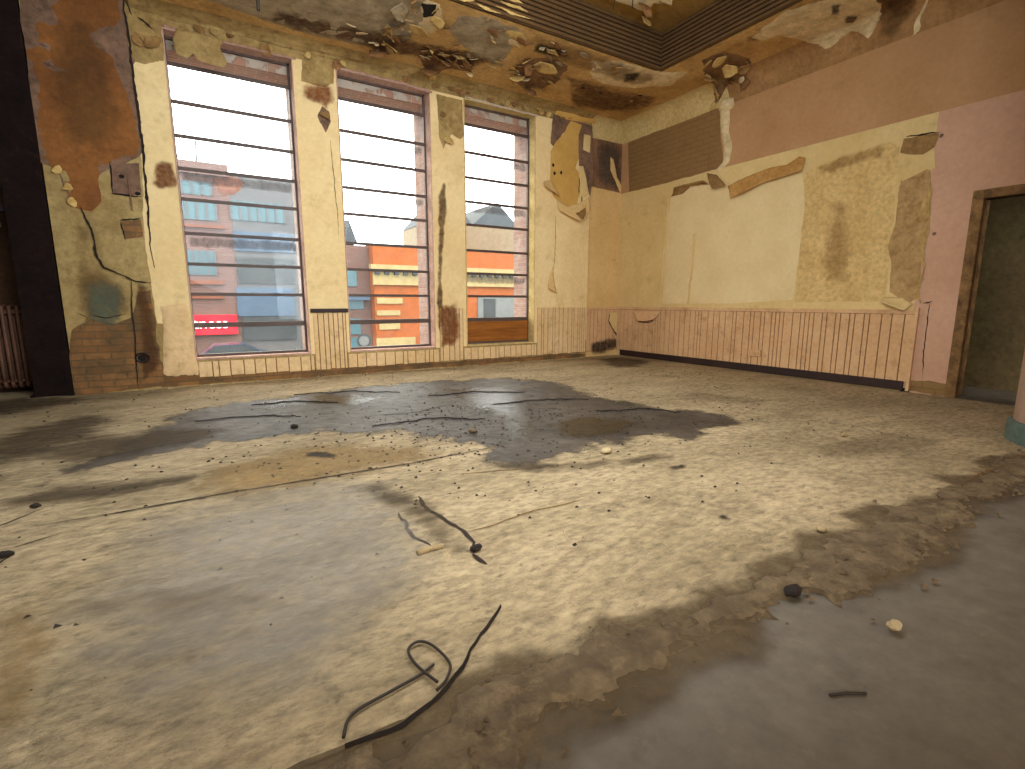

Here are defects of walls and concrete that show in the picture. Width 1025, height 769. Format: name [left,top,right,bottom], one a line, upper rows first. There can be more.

flaking render [179,0,751,206]
spalling [750,0,882,49]
spalling [914,0,928,35]
crack [78,0,155,388]
peeling [19,0,585,395]
water stain [437,184,459,345]
flaking render [795,132,944,303]
water stain [60,377,740,473]
spalling [328,452,1025,769]